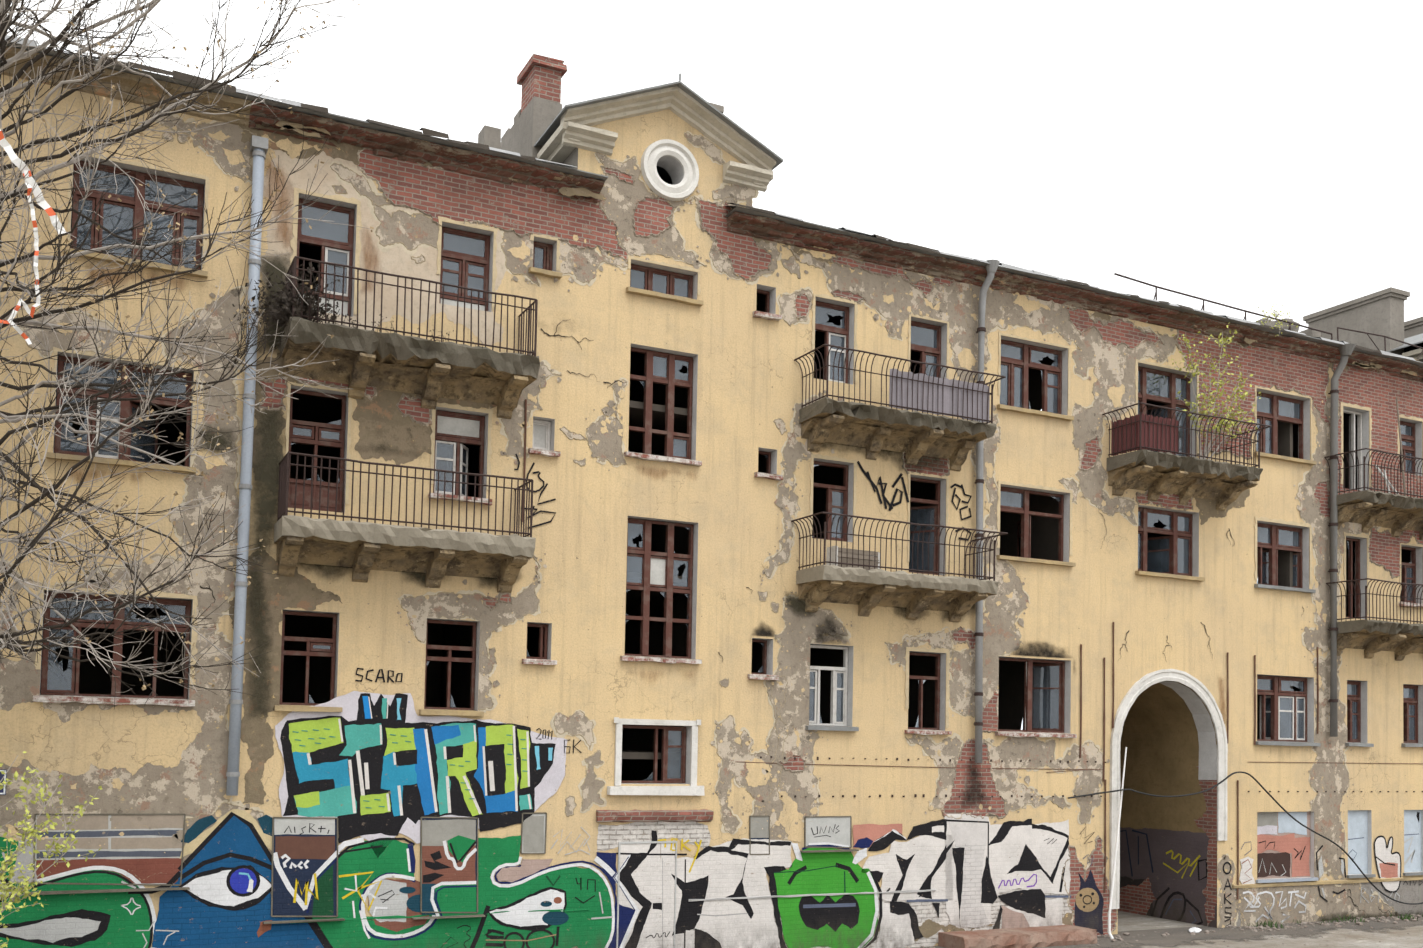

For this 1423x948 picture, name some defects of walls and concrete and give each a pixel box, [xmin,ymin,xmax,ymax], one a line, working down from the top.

mould [261,256,288,352]
crack [541,320,626,388]
peeling [0,285,273,873]
leakage [249,410,284,715]
flaking render [140,104,1423,935]